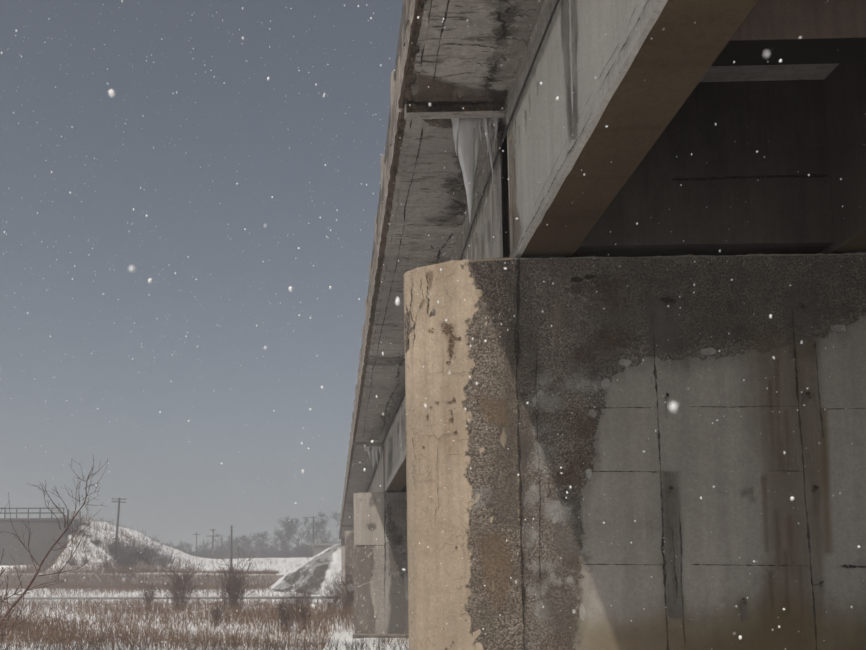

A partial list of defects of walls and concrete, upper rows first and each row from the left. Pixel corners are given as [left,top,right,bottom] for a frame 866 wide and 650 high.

crack [361,126,465,437]
water stain [412,0,555,260]
crack [432,0,536,87]
crack [514,0,649,650]
crack [584,314,669,650]
spalling [404,254,866,650]
crack [672,173,829,181]
water stain [661,515,841,650]
crack [690,310,866,649]